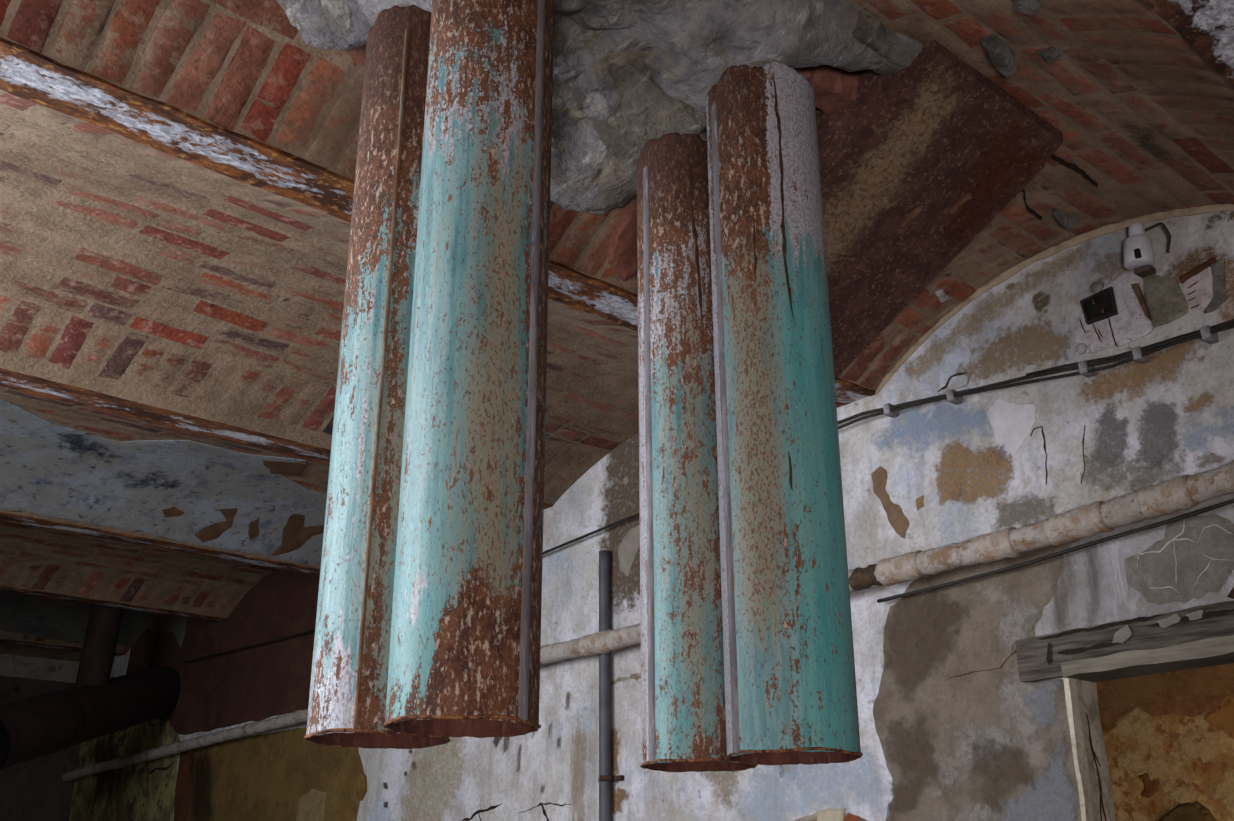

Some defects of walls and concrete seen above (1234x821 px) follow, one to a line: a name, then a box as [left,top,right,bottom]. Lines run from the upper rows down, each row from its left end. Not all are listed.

peeling [262,460,306,476]
peeling [162,506,184,518]
peeling [195,508,238,542]
peeling [248,517,260,540]
peeling [272,513,324,556]
peeling [871,466,924,538]
crack [1125,513,1234,605]
peeling [873,493,1234,821]
crack [1086,713,1107,821]
crack [462,802,571,821]
flaking render [794,808,868,821]